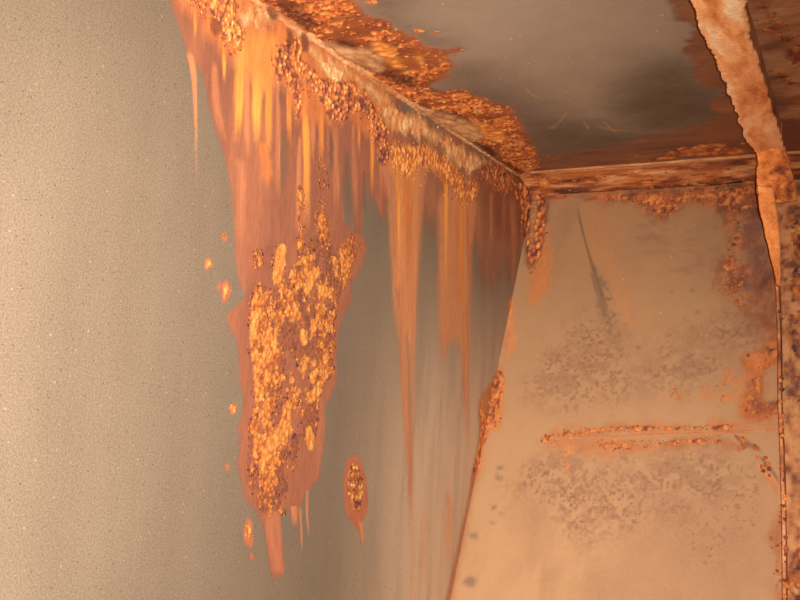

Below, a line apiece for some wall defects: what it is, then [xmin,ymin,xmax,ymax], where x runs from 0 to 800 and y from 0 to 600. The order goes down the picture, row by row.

rust [167,0,800,600]